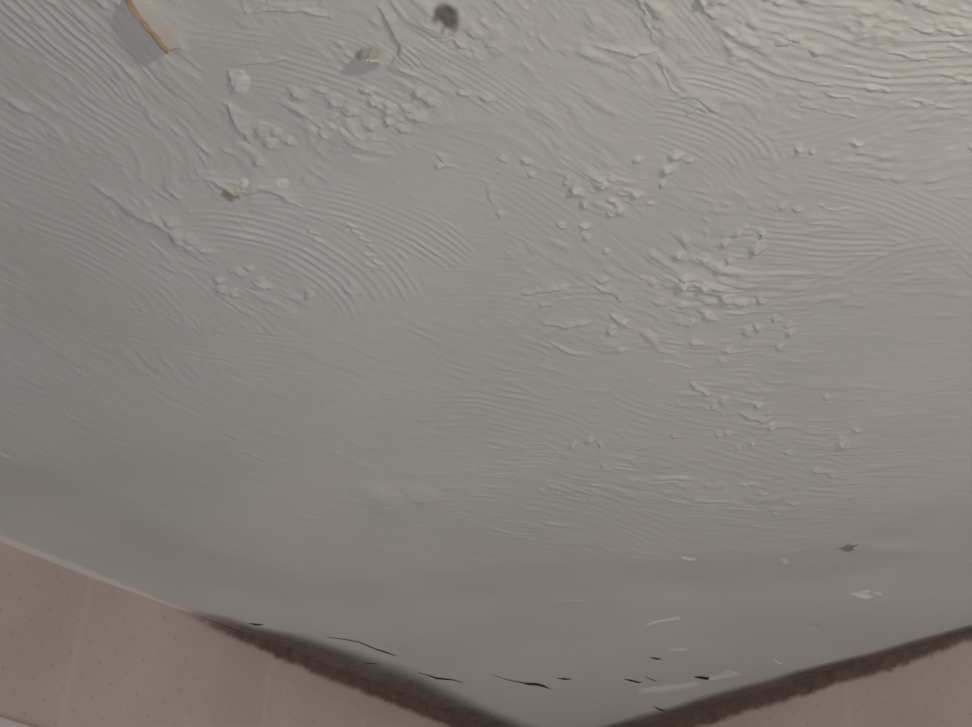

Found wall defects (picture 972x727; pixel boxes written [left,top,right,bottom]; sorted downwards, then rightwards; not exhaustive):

peeling [125,0,183,54]
crack [329,637,395,664]
mould [217,622,516,727]
crack [494,675,571,689]
mould [611,627,972,727]